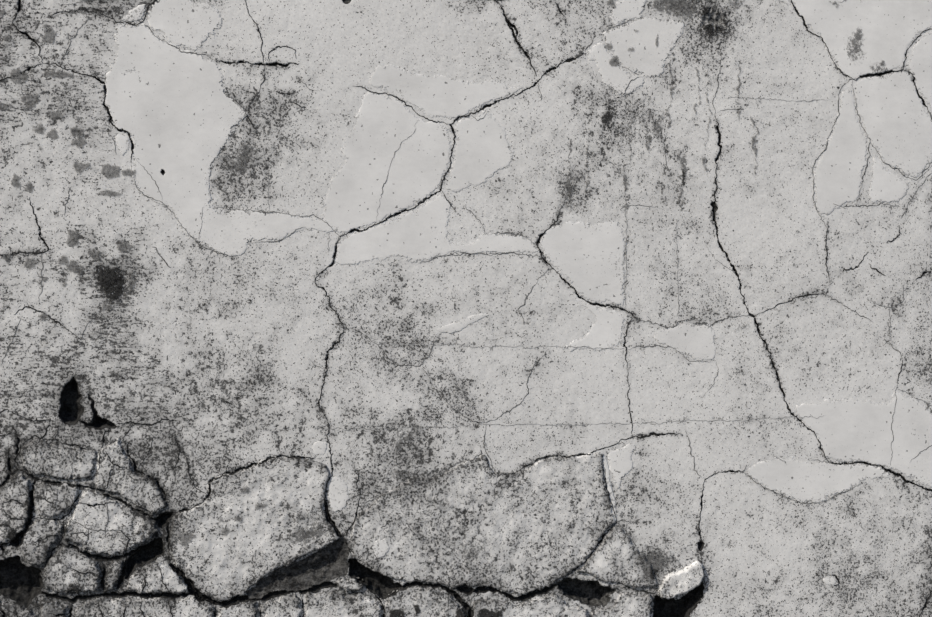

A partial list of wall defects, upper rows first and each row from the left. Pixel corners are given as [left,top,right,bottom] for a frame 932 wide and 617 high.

crack [0,0,232,257]
damp [649,0,727,36]
crack [0,199,93,365]
crack [219,0,932,617]
crack [0,394,386,617]
spalling [0,377,704,617]